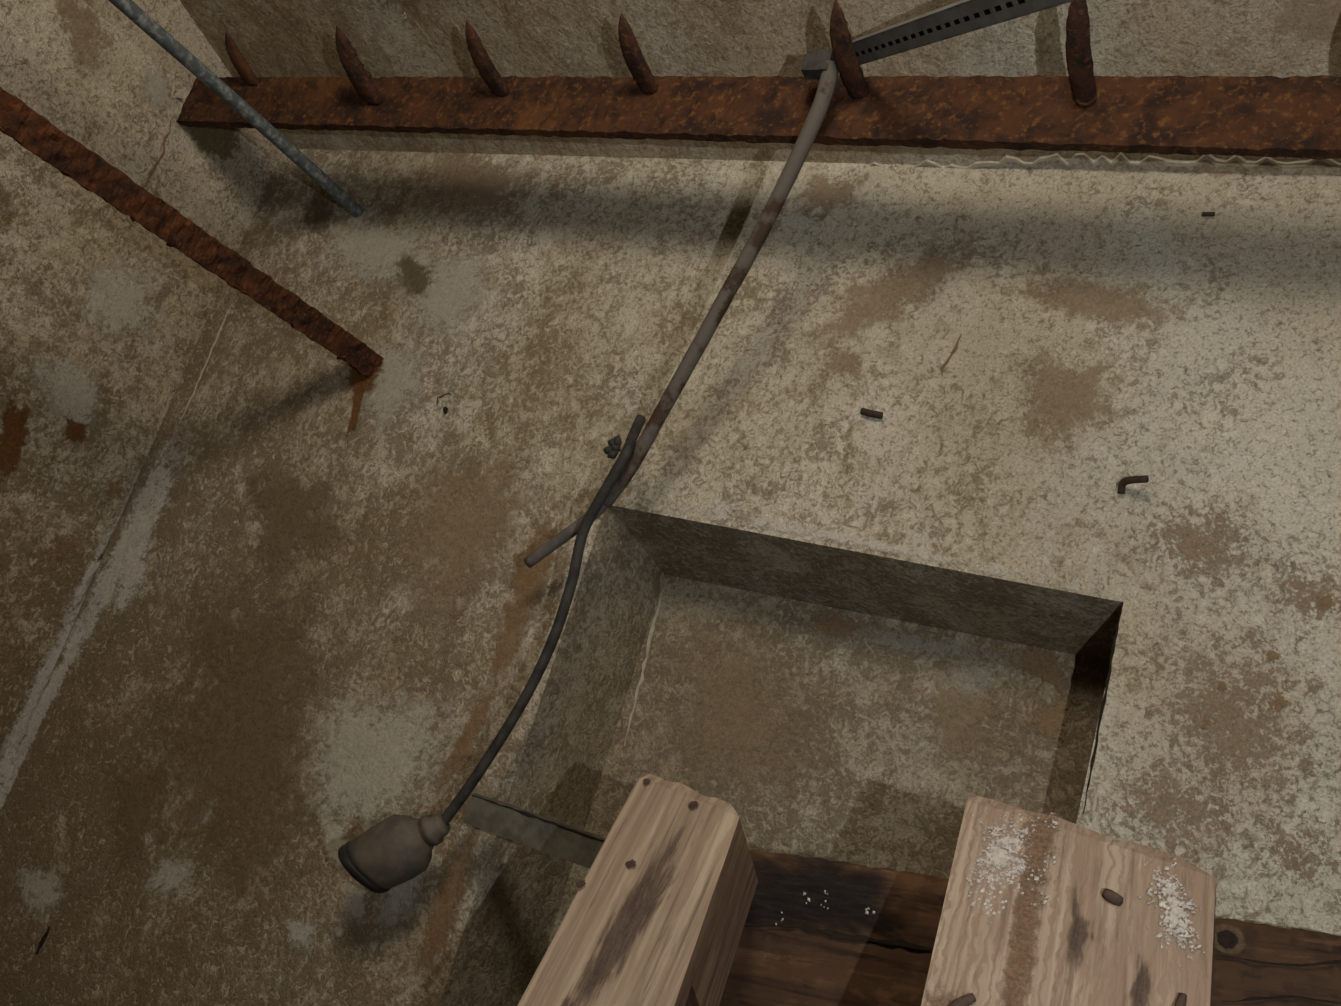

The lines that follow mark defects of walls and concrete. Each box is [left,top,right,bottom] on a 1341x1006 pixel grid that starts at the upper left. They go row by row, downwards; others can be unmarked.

corrosion [0,87,384,435]
corrosion [0,400,28,482]
corrosion [66,419,86,442]
damp [0,437,183,809]
damp [109,596,445,893]
damp [17,867,63,916]
damp [286,920,317,949]
damp [347,872,424,924]